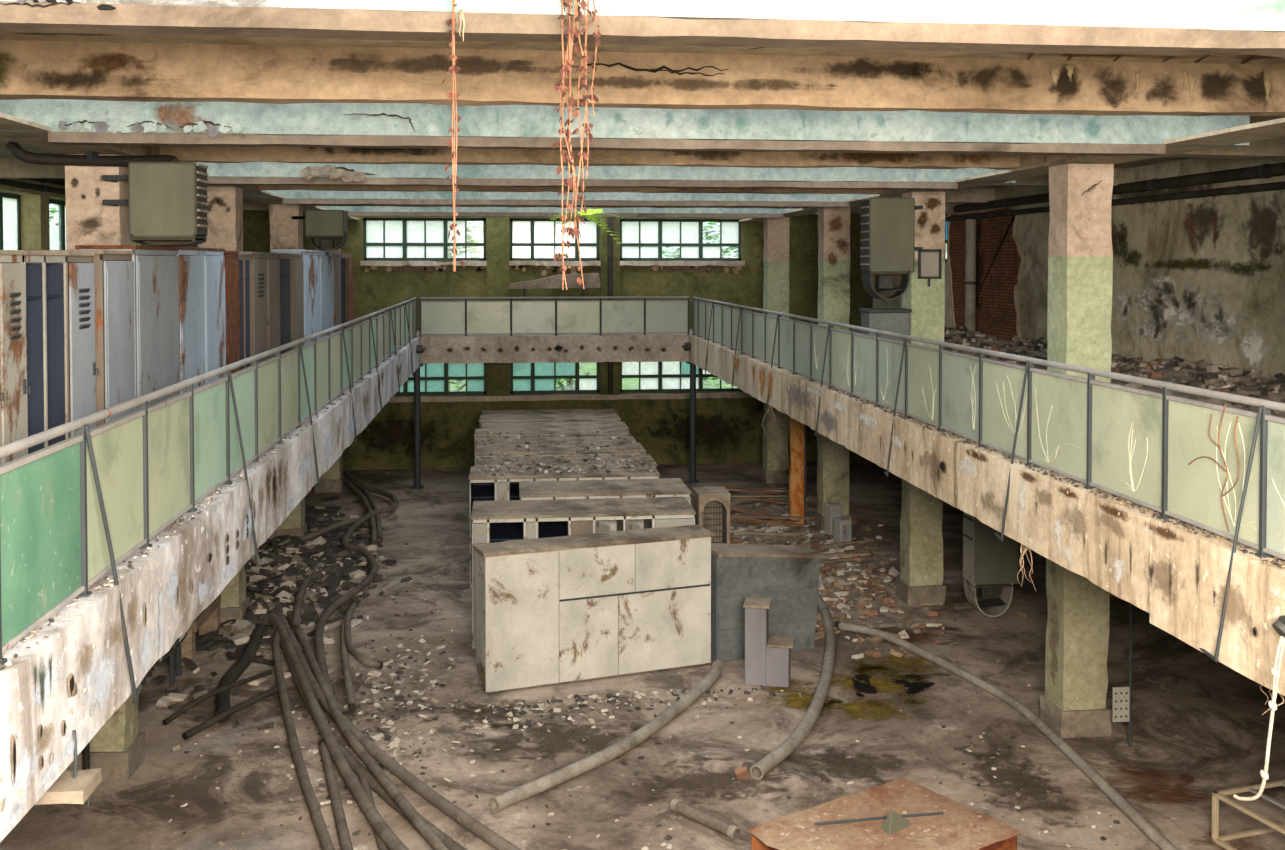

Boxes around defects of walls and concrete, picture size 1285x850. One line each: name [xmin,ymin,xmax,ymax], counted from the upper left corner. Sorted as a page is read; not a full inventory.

spalling [1,0,80,8]
water stain [37,53,148,90]
water stain [330,55,535,74]
crack [572,47,766,76]
water stain [554,67,809,91]
water stain [828,58,931,87]
water stain [1099,71,1271,107]
peeling [58,118,243,138]
water stain [309,147,438,156]
water stain [820,153,918,164]
peeling [300,165,375,182]
water stain [34,658,52,707]